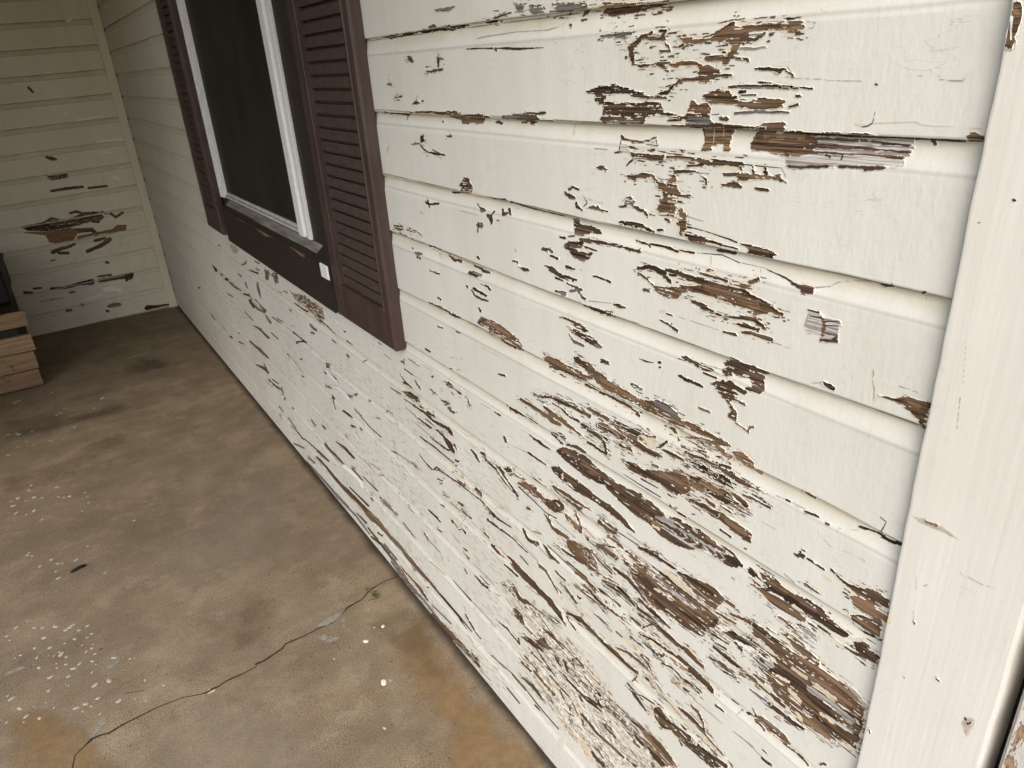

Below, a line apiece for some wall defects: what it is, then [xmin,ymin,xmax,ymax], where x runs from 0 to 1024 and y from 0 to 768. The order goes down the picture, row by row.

peeling [405,52,445,76]
peeling [383,75,554,138]
peeling [411,133,447,158]
peeling [458,176,512,233]
peeling [482,0,985,349]
peeling [20,210,134,313]
peeling [874,386,932,429]
peeling [211,253,891,768]
crack [72,576,398,768]